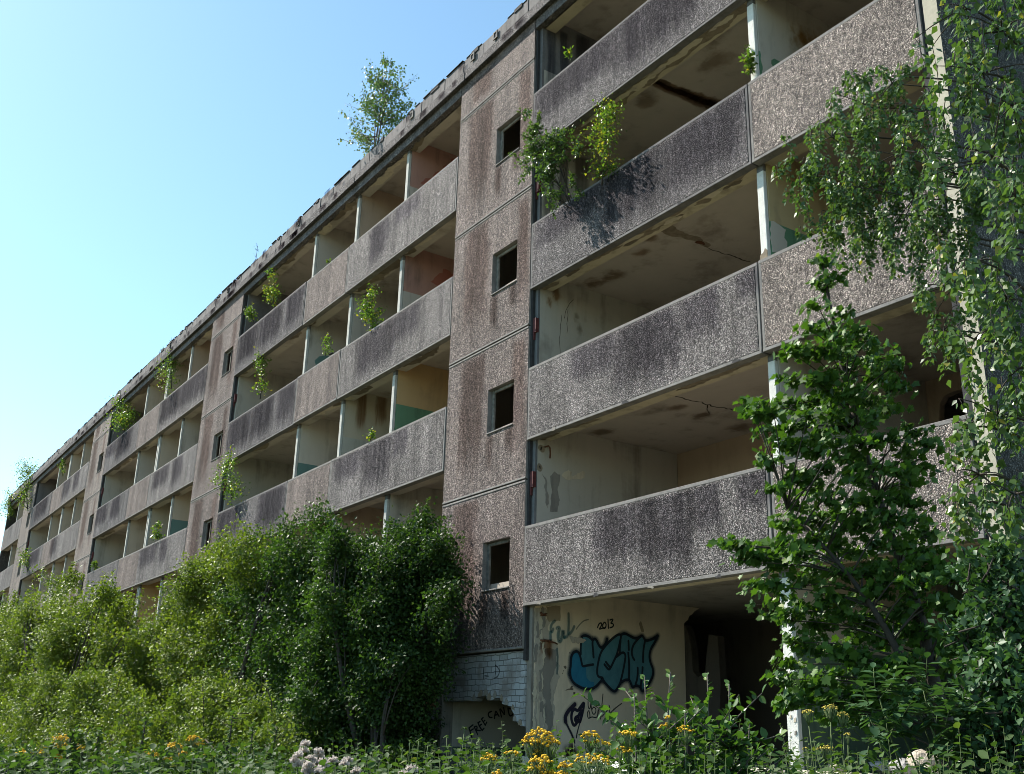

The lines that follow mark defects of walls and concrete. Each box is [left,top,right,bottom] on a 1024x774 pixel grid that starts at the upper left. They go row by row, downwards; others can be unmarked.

crack [675,396,732,412]
flaking render [472,602,575,754]